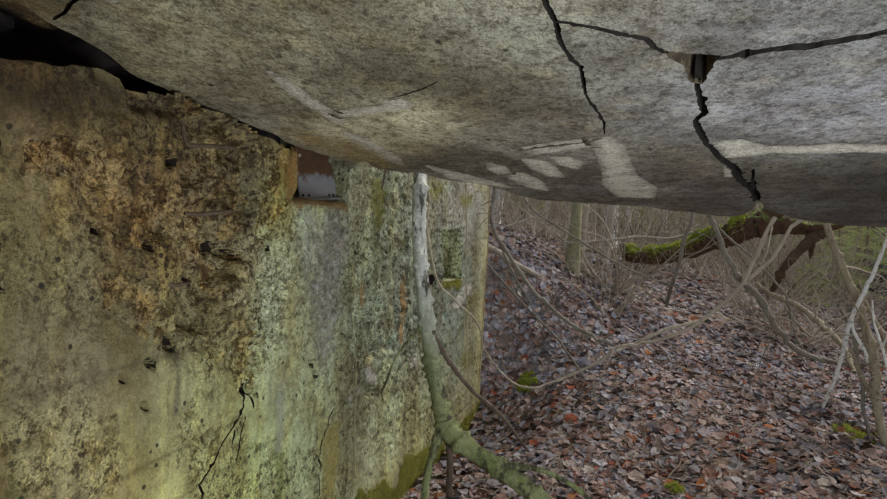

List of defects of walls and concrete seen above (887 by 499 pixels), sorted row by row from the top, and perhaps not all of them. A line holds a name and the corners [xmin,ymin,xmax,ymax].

crack [53,0,79,20]
crack [388,81,437,99]
crack [520,0,669,151]
crack [693,29,887,202]
spalling [23,134,167,252]
crack [198,379,254,499]